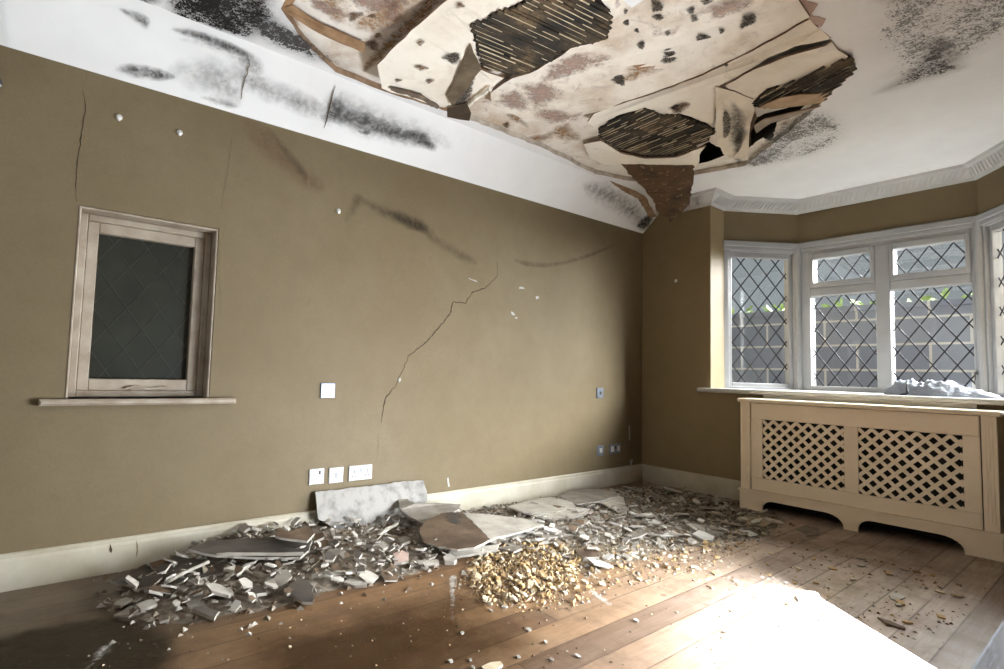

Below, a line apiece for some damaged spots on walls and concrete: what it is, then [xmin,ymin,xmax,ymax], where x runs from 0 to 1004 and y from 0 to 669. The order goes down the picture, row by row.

leakage [123,67,169,78]
leakage [171,0,341,68]
leakage [443,52,459,64]
leakage [454,78,475,106]
peeling [800,0,826,27]
leakage [879,0,1004,85]
crack [75,70,87,201]
leakage [328,103,432,148]
flaking render [610,181,656,218]
crack [374,238,498,462]